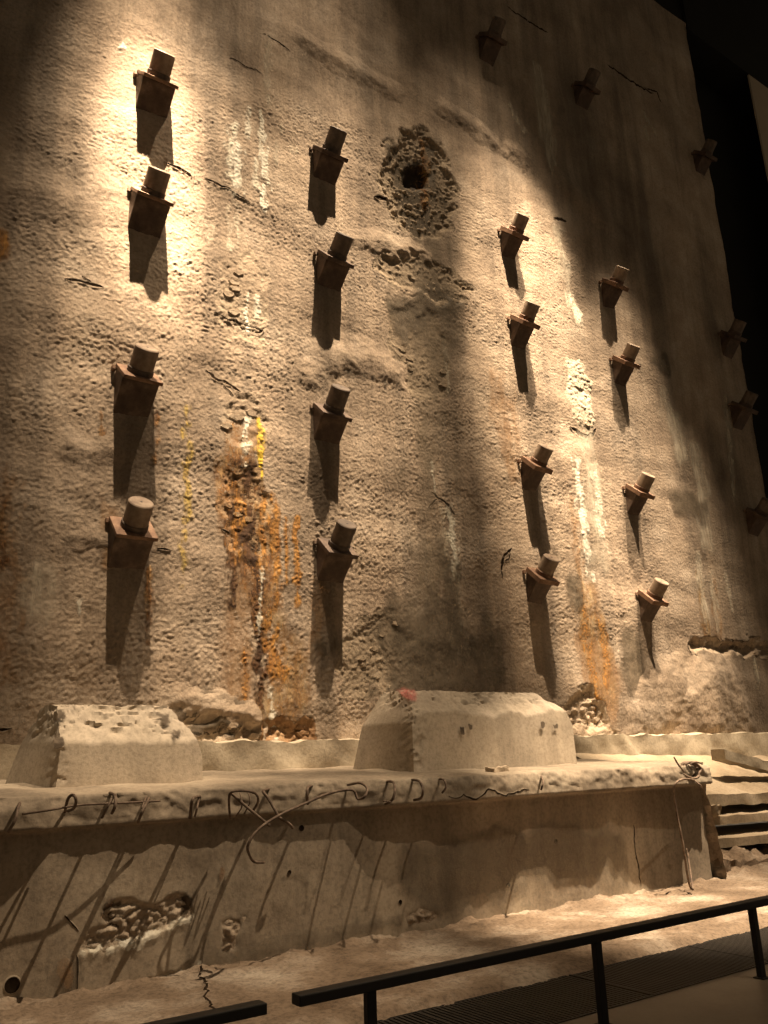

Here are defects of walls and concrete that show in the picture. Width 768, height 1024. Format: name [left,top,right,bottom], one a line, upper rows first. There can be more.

crack [607,64,662,103]
leakage [226,107,272,211]
spalling [376,125,460,241]
leakage [566,458,606,609]
corrosion [215,422,309,740]
corrosion [579,581,614,720]
spalling [688,635,768,659]
spalling [7,791,161,833]
spalling [228,782,369,864]
spalling [80,894,193,956]
crack [197,964,216,1009]